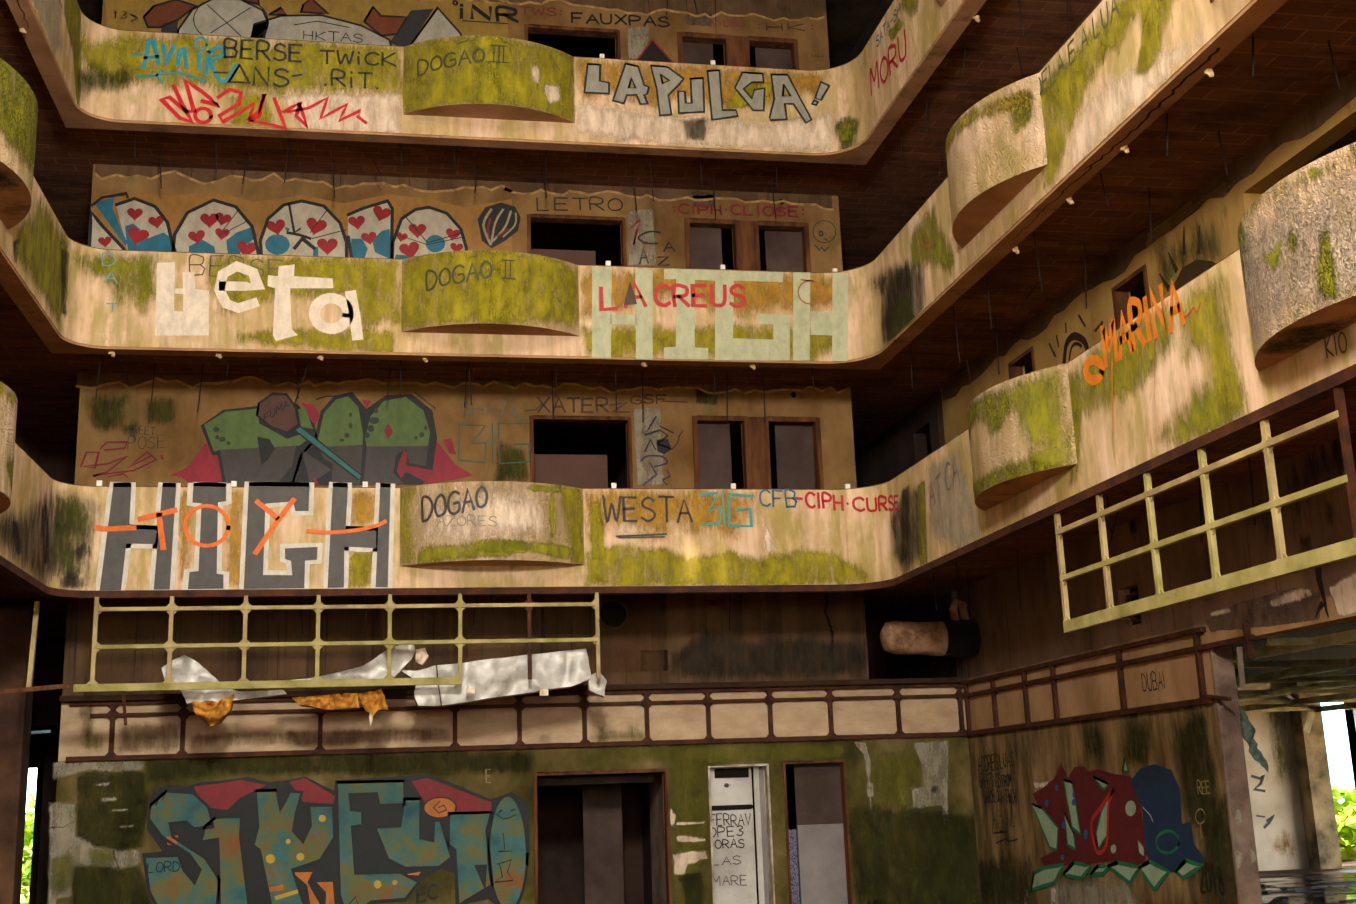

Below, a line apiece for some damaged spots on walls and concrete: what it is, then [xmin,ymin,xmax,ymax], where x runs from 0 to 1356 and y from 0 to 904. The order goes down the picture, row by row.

water stain [0,494,94,588]
water stain [891,455,980,572]